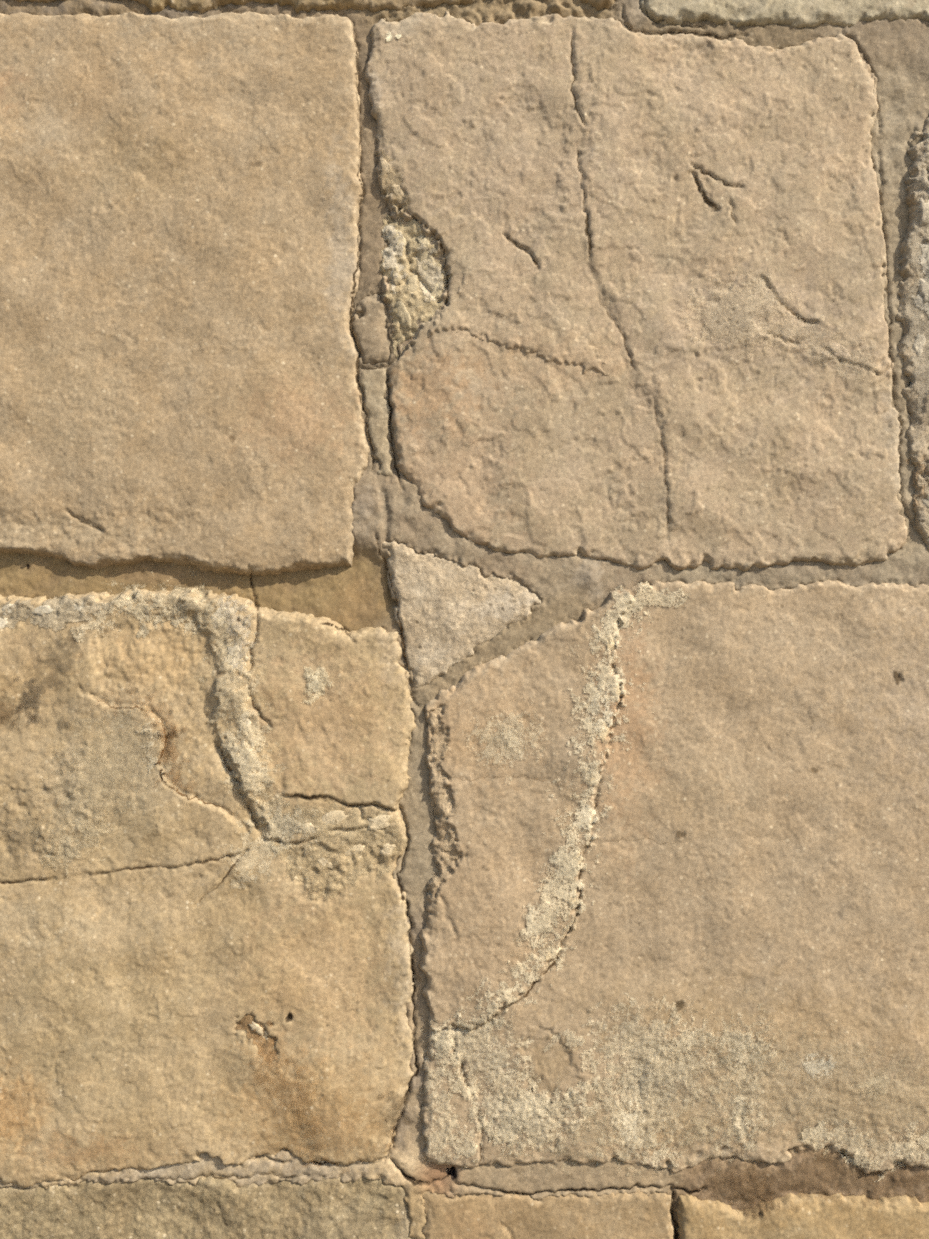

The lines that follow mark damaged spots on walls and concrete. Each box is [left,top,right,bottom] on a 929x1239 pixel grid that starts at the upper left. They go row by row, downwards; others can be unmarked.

crack [570,40,583,122]
crack [577,157,592,254]
spalling [375,141,453,357]
crack [610,653,622,736]
crack [110,854,243,899]
crack [159,794,701,1239]
damp [799,1121,871,1168]
damp [895,1122,929,1159]